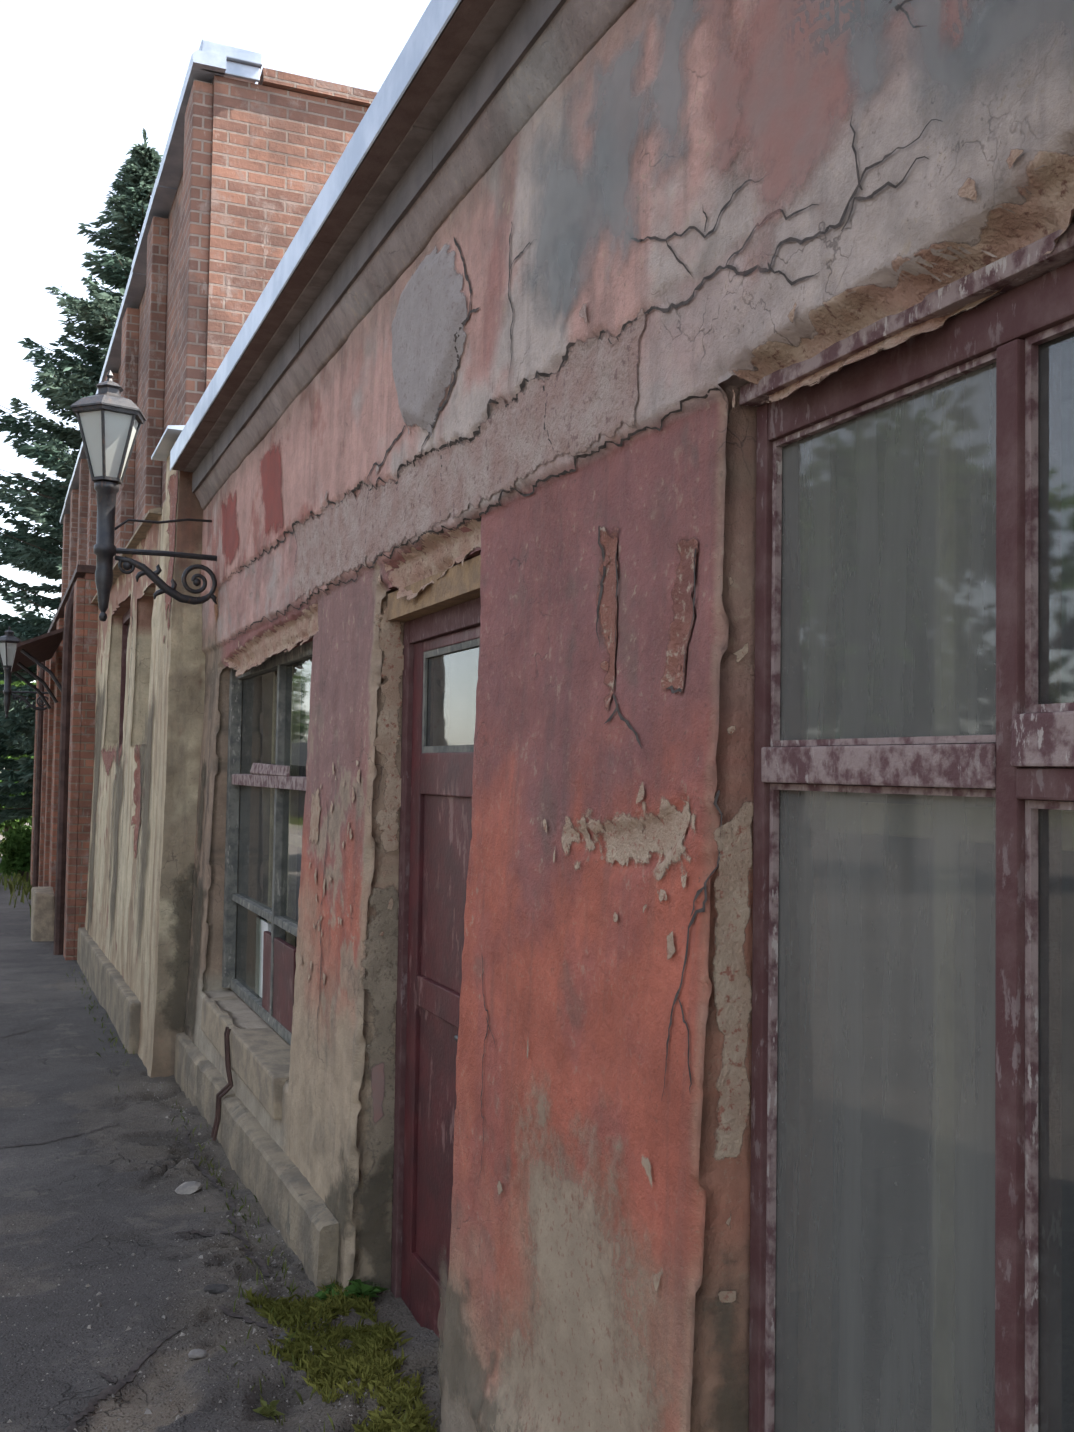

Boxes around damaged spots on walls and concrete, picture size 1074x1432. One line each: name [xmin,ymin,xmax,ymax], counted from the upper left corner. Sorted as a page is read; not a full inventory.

crack [213,112,943,649]
peeling [222,493,239,564]
peeling [733,643,748,663]
crack [604,682,642,748]
peeling [309,760,360,845]
spalling [543,782,696,913]
spalling [667,931,675,960]
peeling [713,802,754,1160]
peeling [361,885,399,1217]
peeling [718,1291,736,1303]
water stain [438,1269,494,1415]